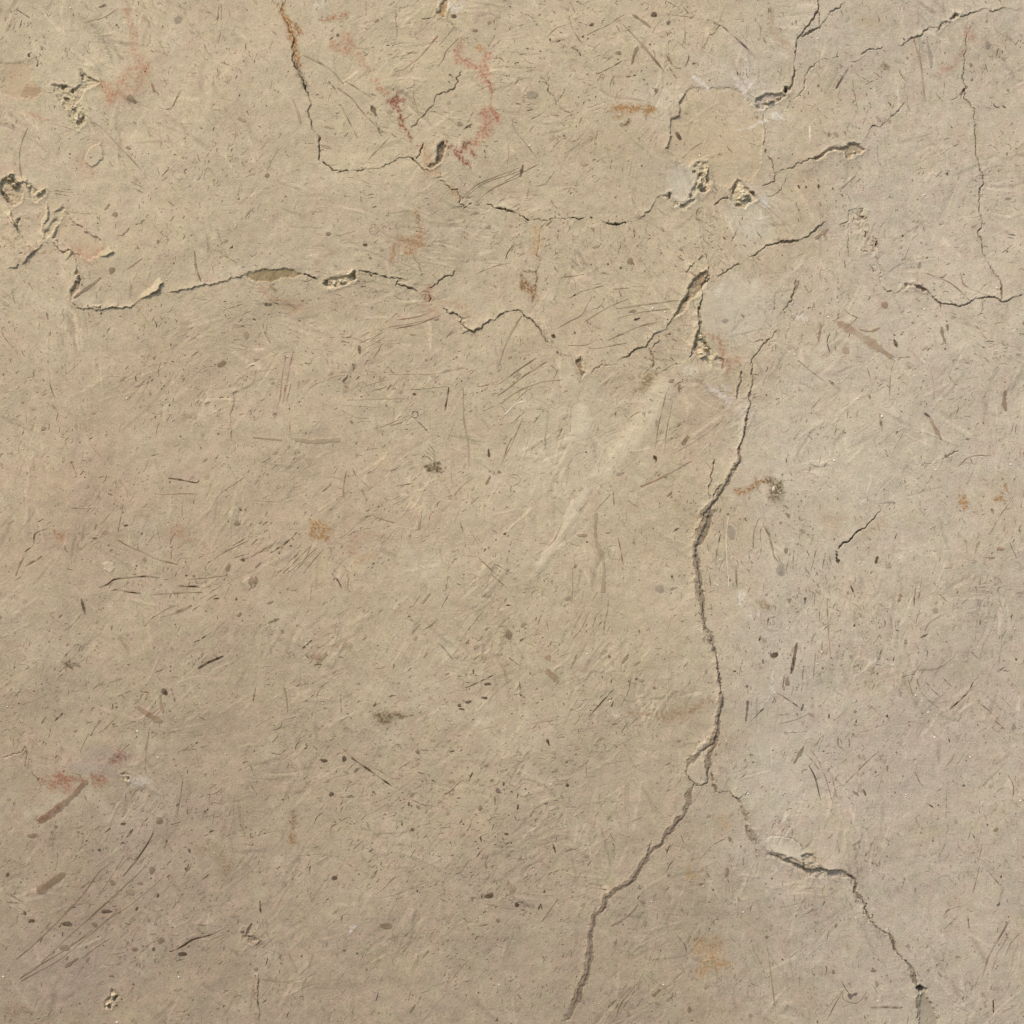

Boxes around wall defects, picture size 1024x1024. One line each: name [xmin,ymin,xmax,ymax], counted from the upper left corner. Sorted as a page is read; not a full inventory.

spalling [0,59,99,131]
crack [279,0,663,288]
rust [445,37,505,170]
peeling [662,86,788,211]
peeling [0,170,115,299]
crack [68,296,138,312]
crack [164,273,247,295]
peeling [246,267,303,284]
spalling [322,269,358,290]
crack [356,0,1024,441]
crack [341,360,370,393]
crack [560,278,921,1024]